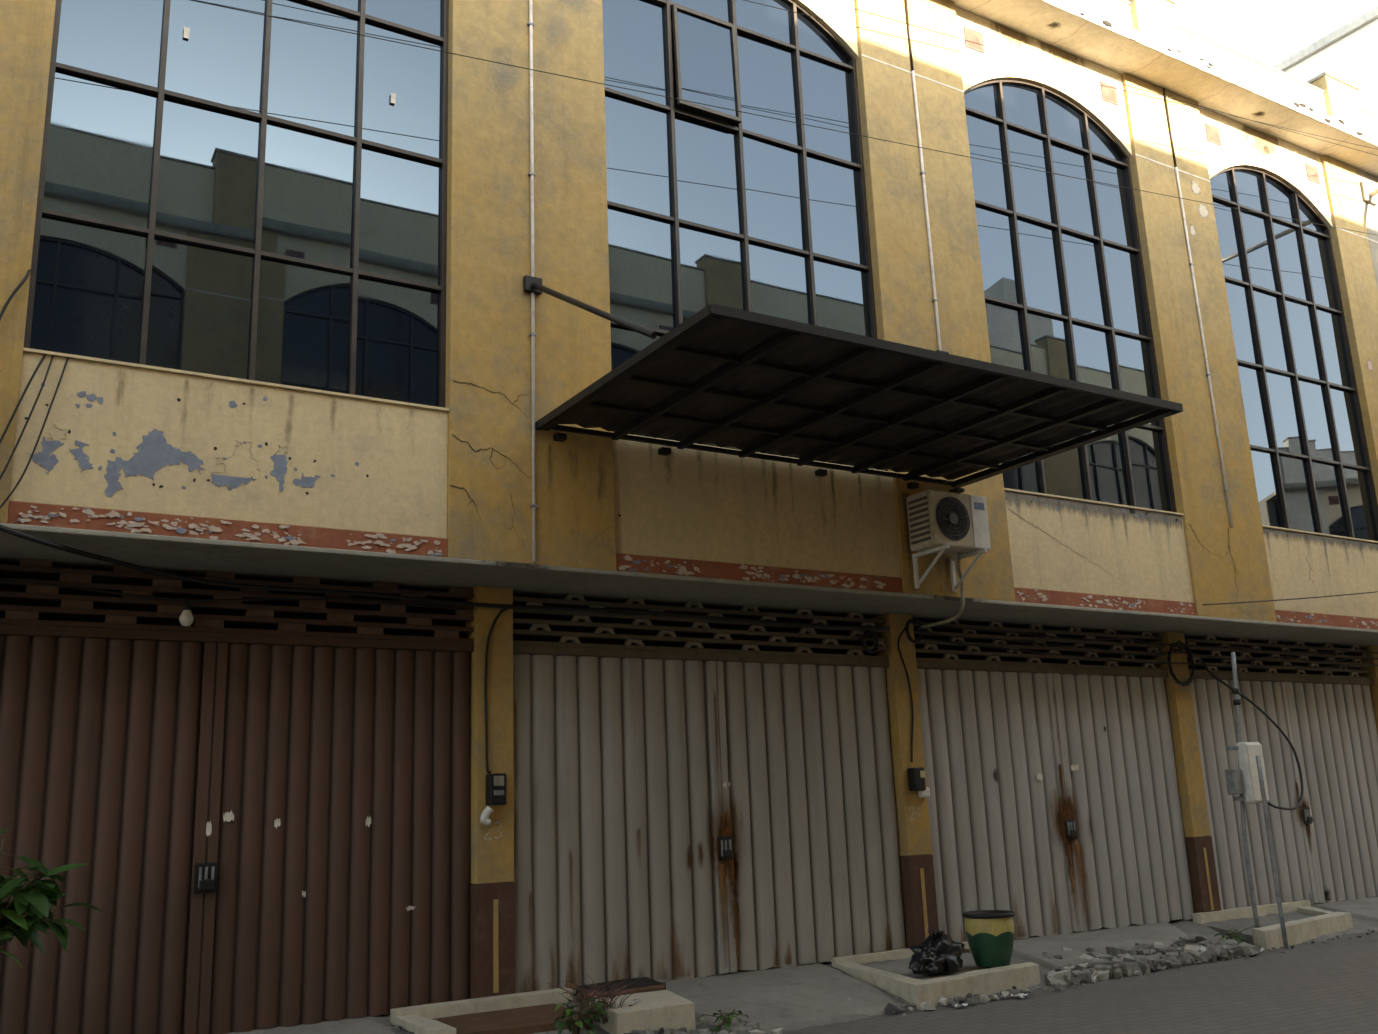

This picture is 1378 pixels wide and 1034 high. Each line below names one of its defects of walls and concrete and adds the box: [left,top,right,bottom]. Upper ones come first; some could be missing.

peeling [1057,0,1375,140]
peeling [75,391,103,408]
crack [453,380,527,414]
peeling [17,427,335,545]
crack [450,434,530,551]
peeling [346,533,443,556]
peeling [739,564,886,589]
peeling [1080,595,1141,610]
crack [1188,523,1239,607]
corrosion [688,809,739,949]
corrosion [1055,764,1093,914]
corrosion [1296,783,1311,846]